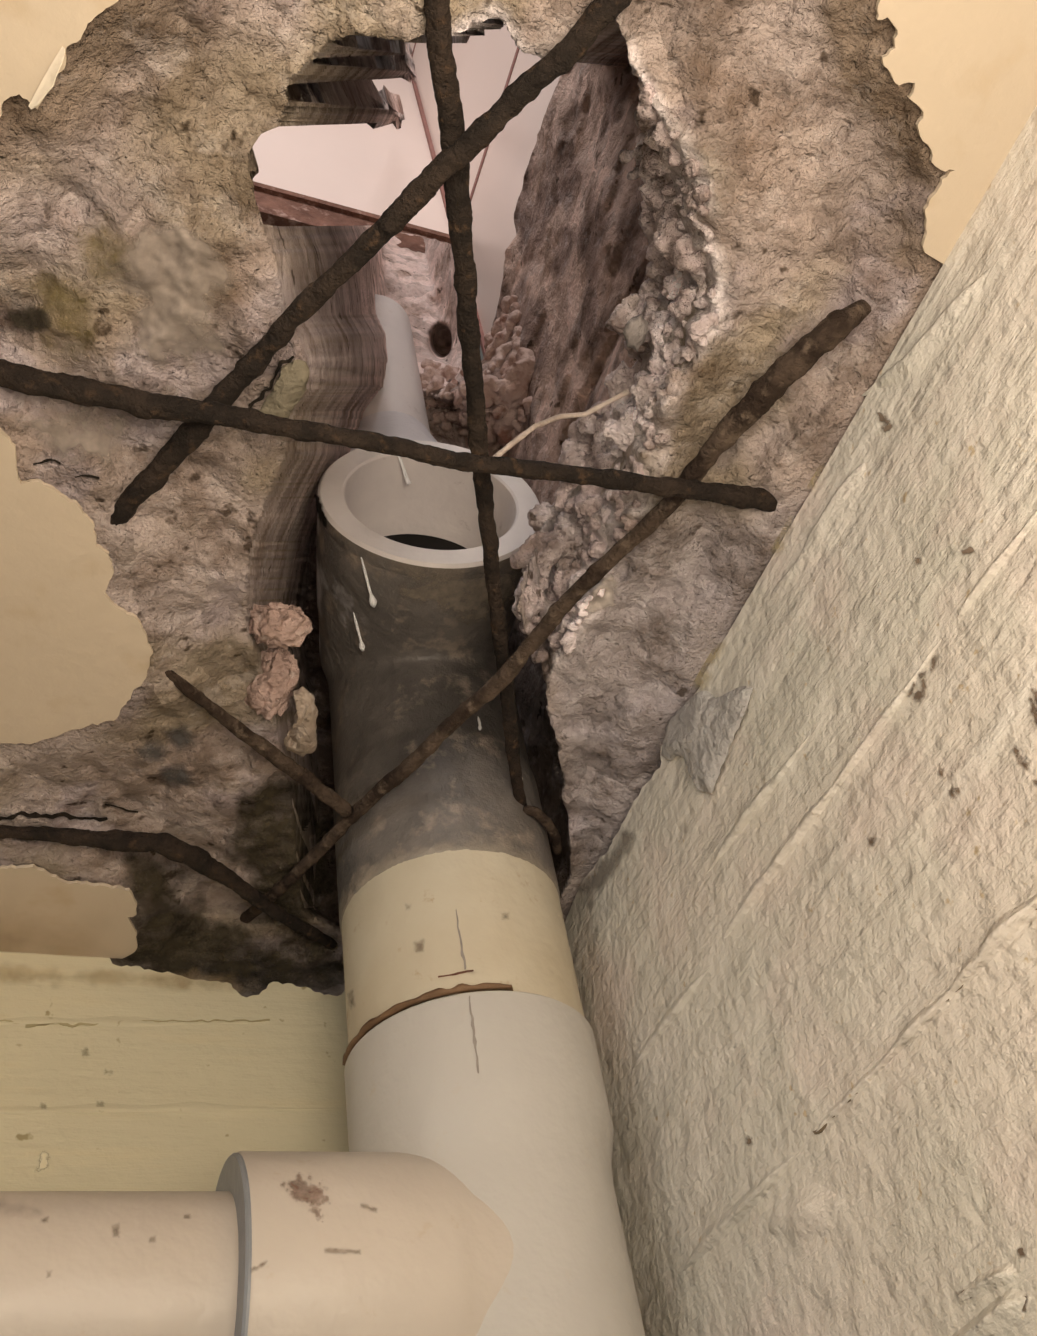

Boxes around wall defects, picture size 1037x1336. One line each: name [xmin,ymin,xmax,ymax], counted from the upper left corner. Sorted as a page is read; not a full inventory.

crack [0,804,138,822]
spalling [0,0,950,998]